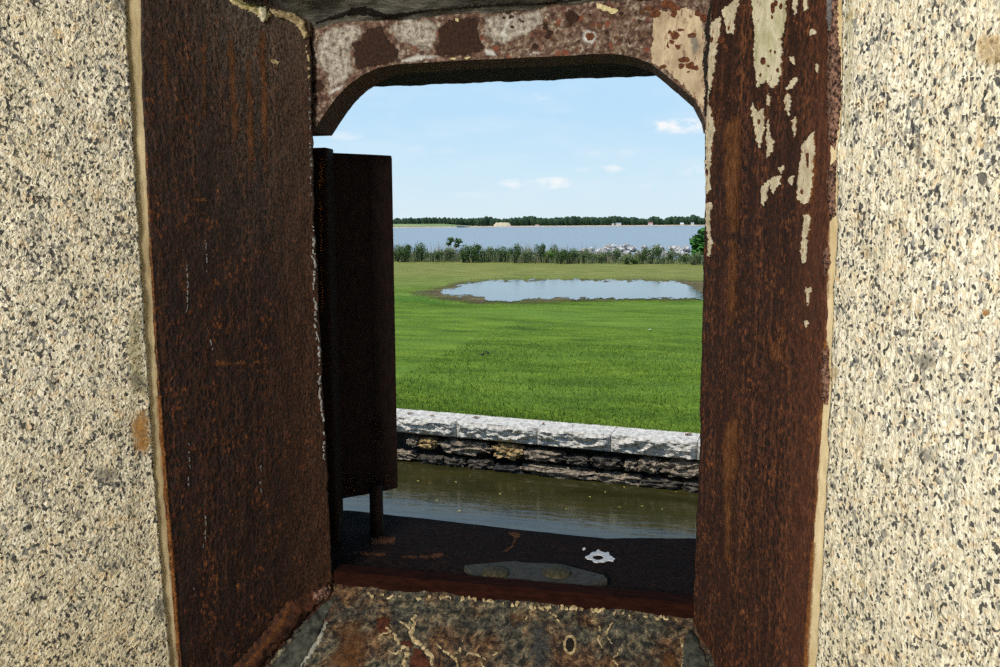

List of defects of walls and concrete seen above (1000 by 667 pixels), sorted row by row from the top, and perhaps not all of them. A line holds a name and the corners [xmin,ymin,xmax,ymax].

peeling [317,25,361,88]
corrosion [352,26,398,69]
peeling [391,19,437,50]
corrosion [435,17,484,56]
peeling [486,11,543,43]
corrosion [532,10,618,49]
peeling [643,0,816,263]
corrosion [723,117,740,325]
corrosion [132,382,181,665]
corrosion [722,419,738,568]
corrosion [804,542,814,667]
corrosion [400,640,430,667]